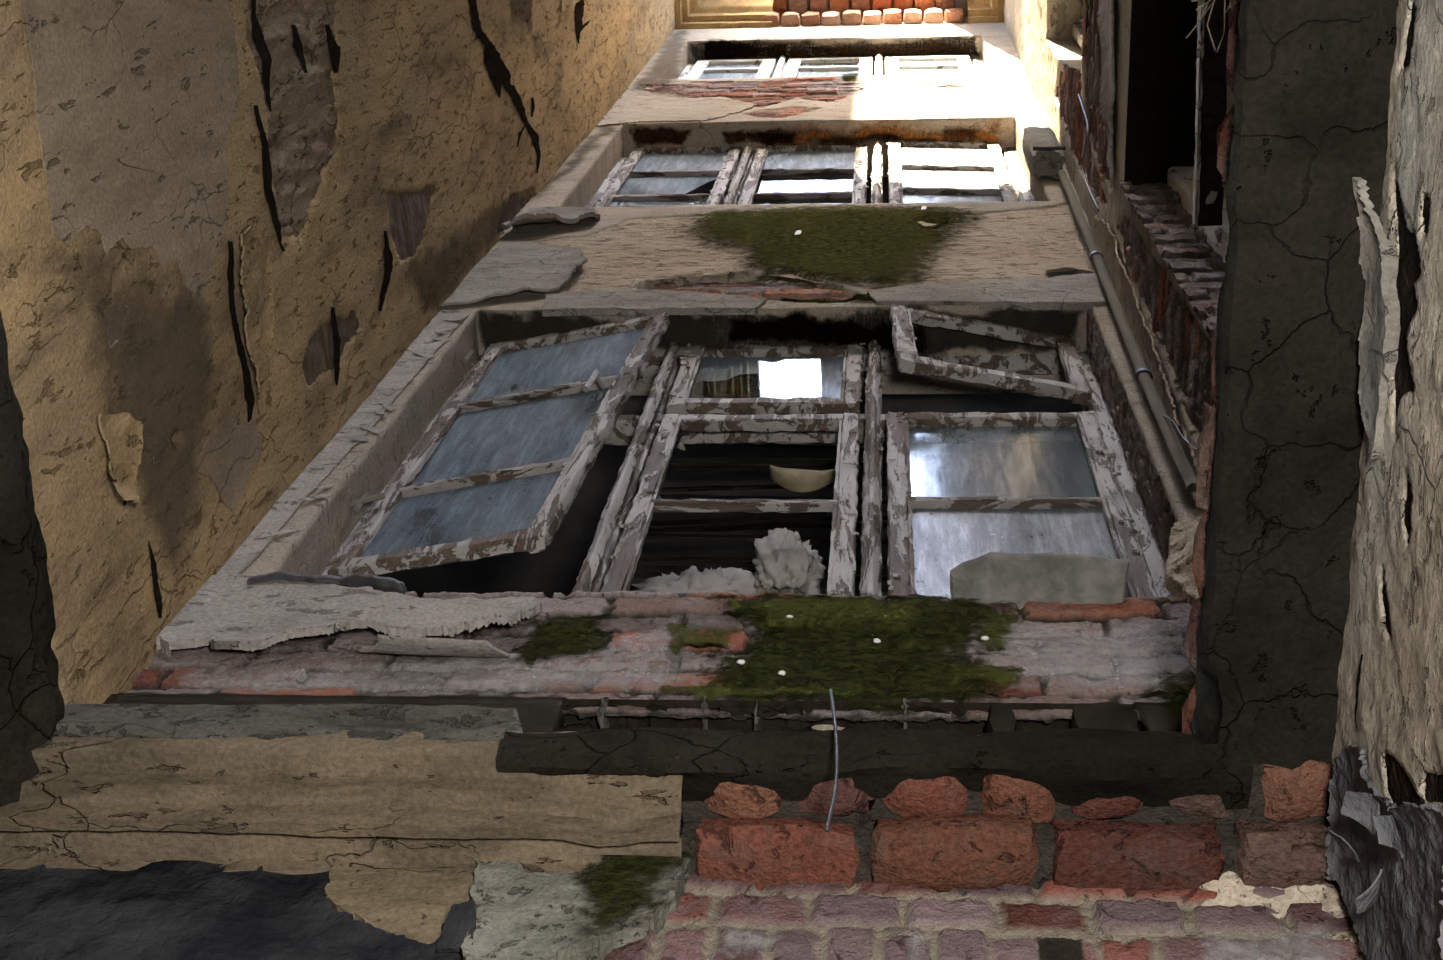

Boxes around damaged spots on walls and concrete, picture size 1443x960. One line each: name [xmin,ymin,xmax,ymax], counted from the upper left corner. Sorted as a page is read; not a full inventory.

crack [468,0,541,173]
spalling [124,0,1216,736]
peeling [1352,177,1430,459]
spalling [0,744,1443,960]